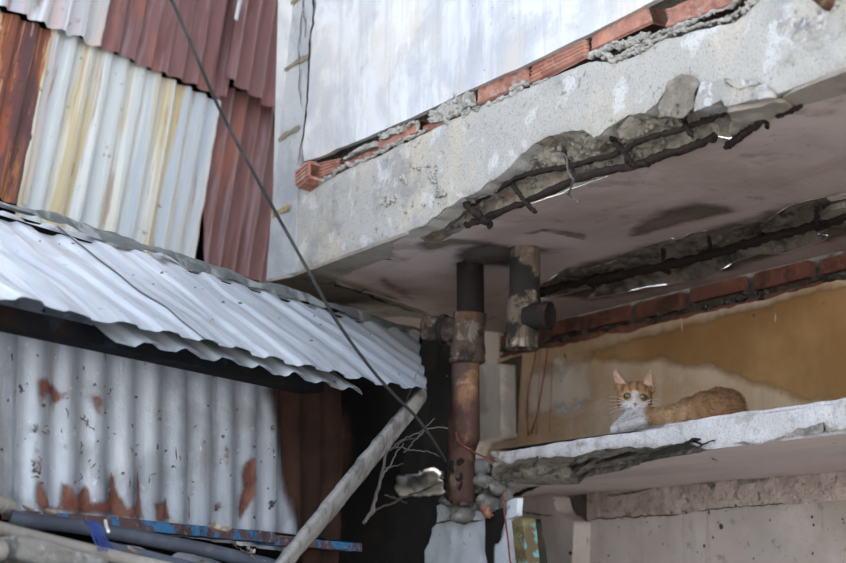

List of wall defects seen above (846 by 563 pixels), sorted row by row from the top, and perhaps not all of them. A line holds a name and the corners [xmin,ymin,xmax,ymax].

crack [298,0,314,163]
spalling [411,74,803,241]
spalling [540,193,846,298]
rust [40,380,61,408]
rust [37,472,142,518]
rust [156,499,169,520]
rust [239,459,256,517]
spalling [490,438,716,484]